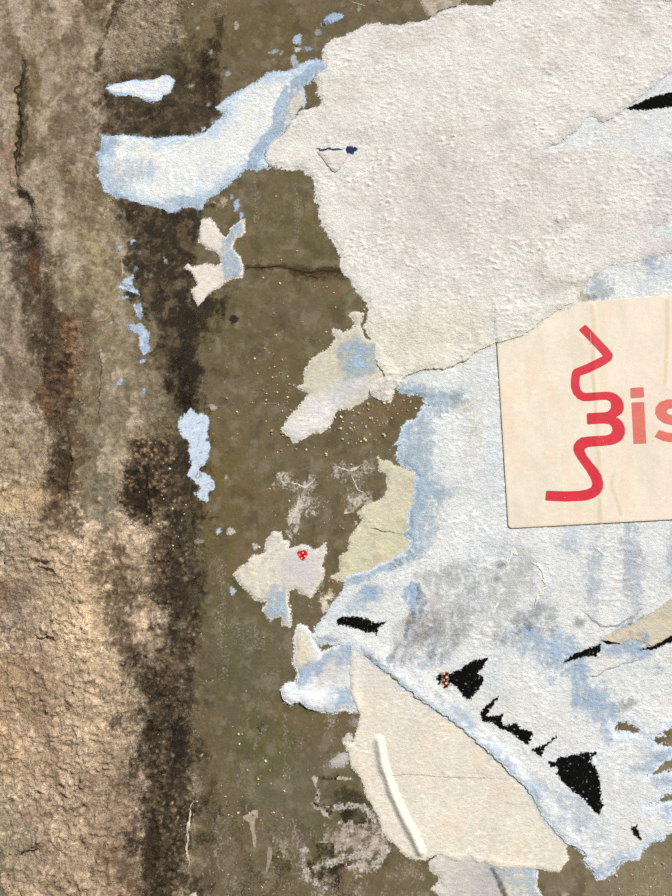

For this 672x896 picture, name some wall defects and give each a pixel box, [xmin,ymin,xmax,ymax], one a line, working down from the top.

spalling [99,0,193,72]
crack [13,71,23,181]
damp [333,460,375,514]
damp [7,195,361,896]
spalling [112,426,205,896]
damp [335,786,374,813]
peeling [300,802,390,891]